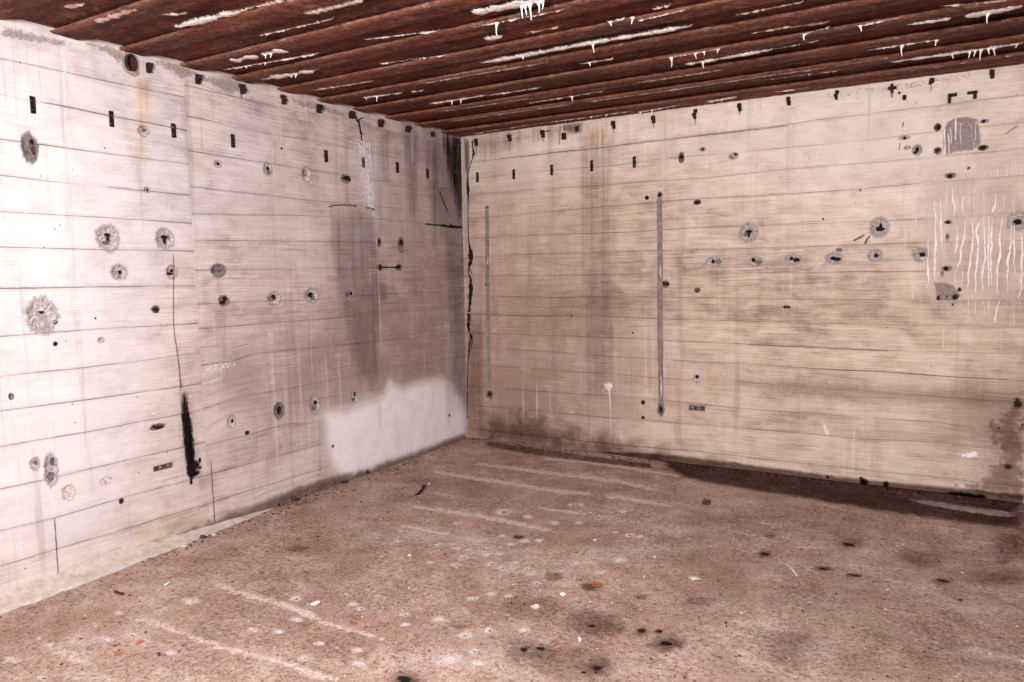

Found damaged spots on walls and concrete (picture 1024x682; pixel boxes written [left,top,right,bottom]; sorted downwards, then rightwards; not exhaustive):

leakage [165,0,284,28]
leakage [225,49,318,80]
leakage [260,0,363,36]
leakage [363,0,692,101]
leakage [429,21,1023,121]
leakage [858,1,1023,32]
leakage [357,136,380,308]
crack [425,141,563,419]
leakage [598,381,1022,517]